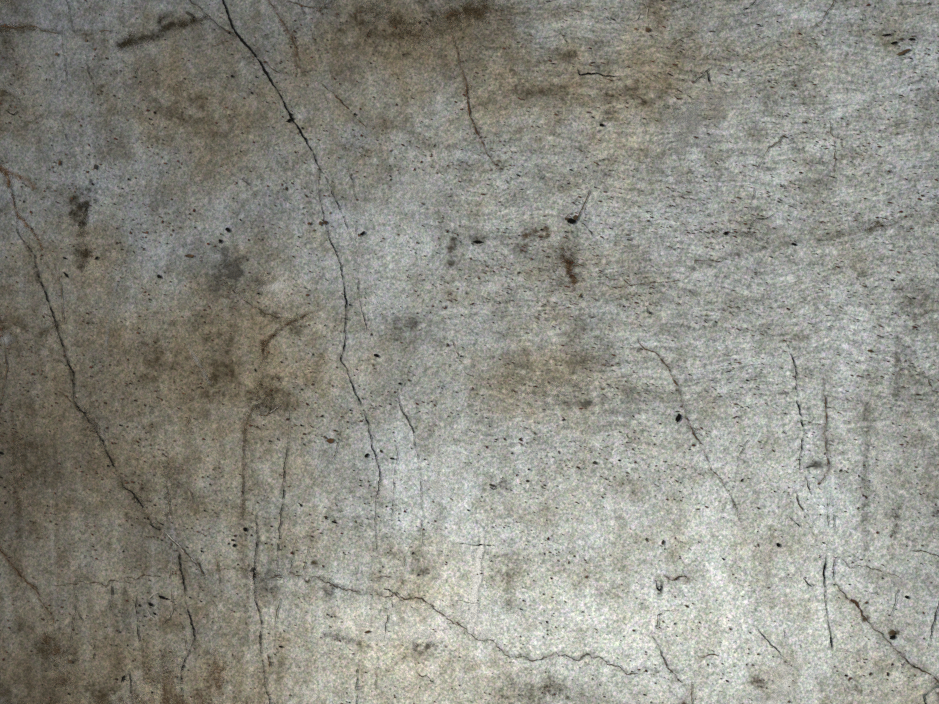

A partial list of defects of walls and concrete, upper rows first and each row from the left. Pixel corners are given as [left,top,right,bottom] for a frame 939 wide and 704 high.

crack [0,0,693,704]
crack [822,557,939,704]